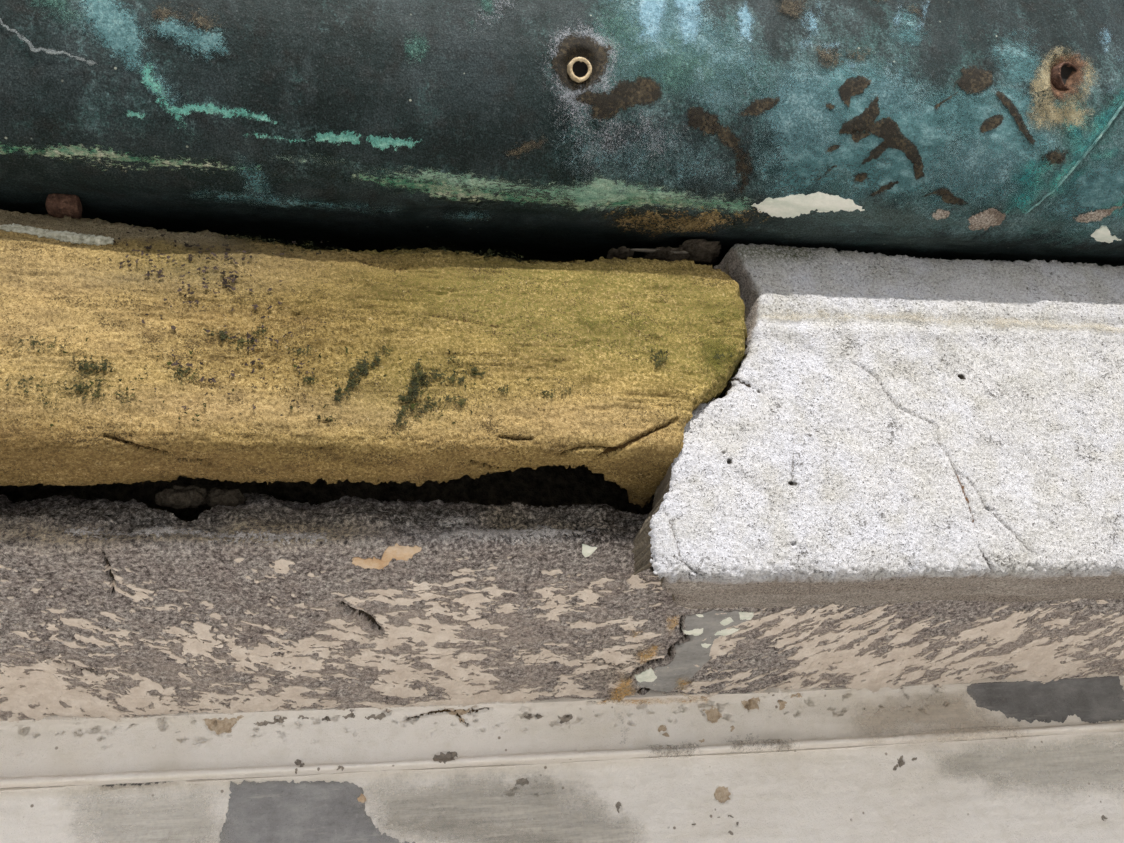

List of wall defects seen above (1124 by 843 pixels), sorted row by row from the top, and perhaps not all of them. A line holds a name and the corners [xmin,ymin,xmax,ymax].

corrosion [1032,50,1092,128]
crack [852,363,1032,567]
peeling [0,556,669,735]
peeling [678,598,1124,732]